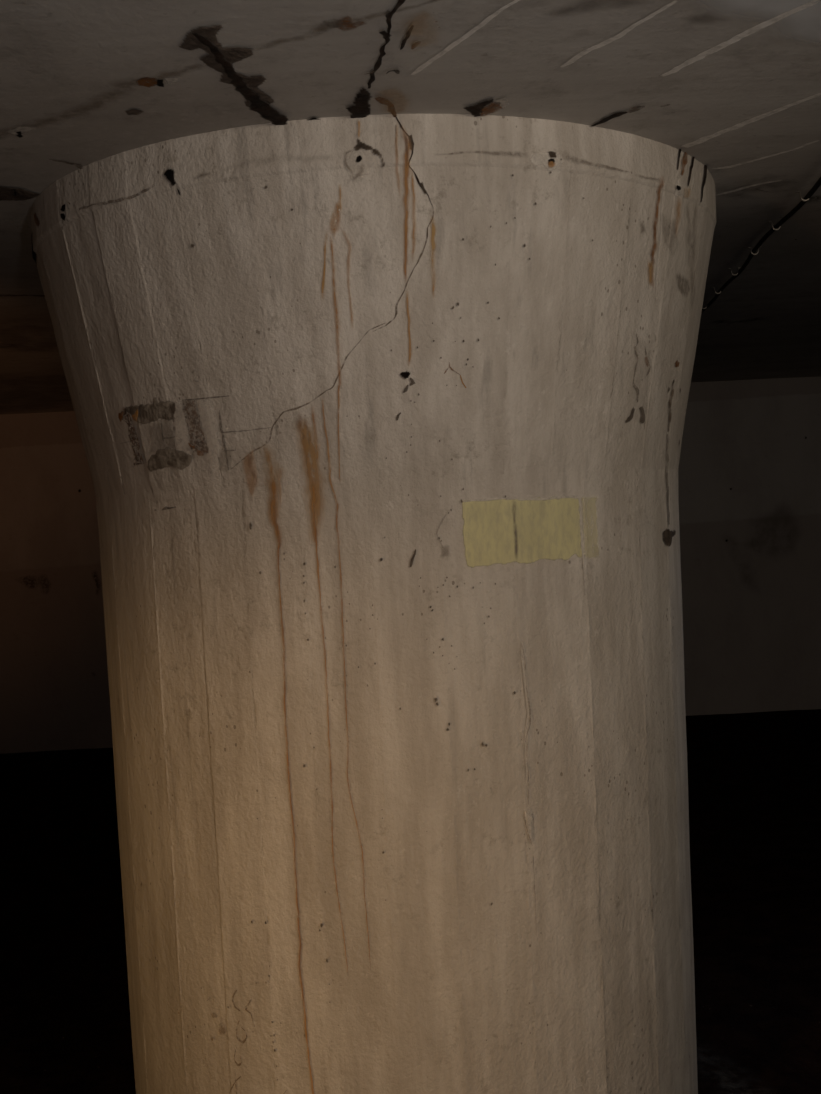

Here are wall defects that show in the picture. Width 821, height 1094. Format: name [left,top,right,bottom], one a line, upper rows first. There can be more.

crack [179,25,288,125]
rust [322,190,341,333]
crack [231,0,437,469]
rust [404,137,415,277]
spalling [118,398,218,472]
rust [298,367,342,607]
rust [268,454,314,1094]